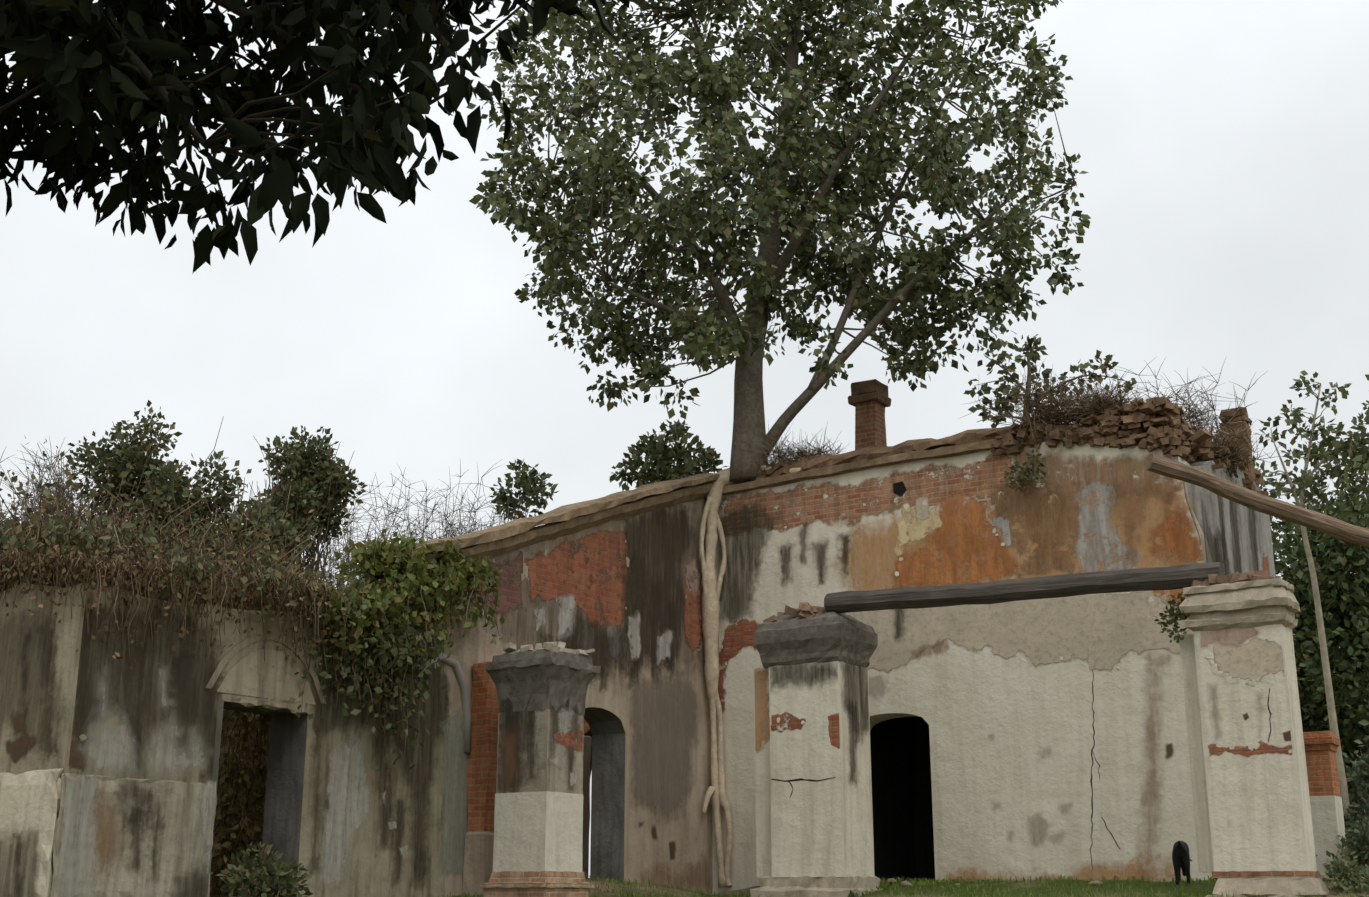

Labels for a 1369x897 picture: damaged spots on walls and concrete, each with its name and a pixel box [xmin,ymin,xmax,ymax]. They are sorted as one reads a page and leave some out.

spalling [720,454,1017,588]
flaking render [1076,482,1140,572]
water stain [0,600,220,876]
water stain [459,508,697,818]
spalling [461,530,826,713]
spalling [754,669,806,751]
crack [771,777,835,797]
spalling [828,714,840,749]
flaking render [846,589,1284,686]
crack [1090,670,1121,872]
spalling [1208,731,1293,757]
water stain [0,836,37,897]